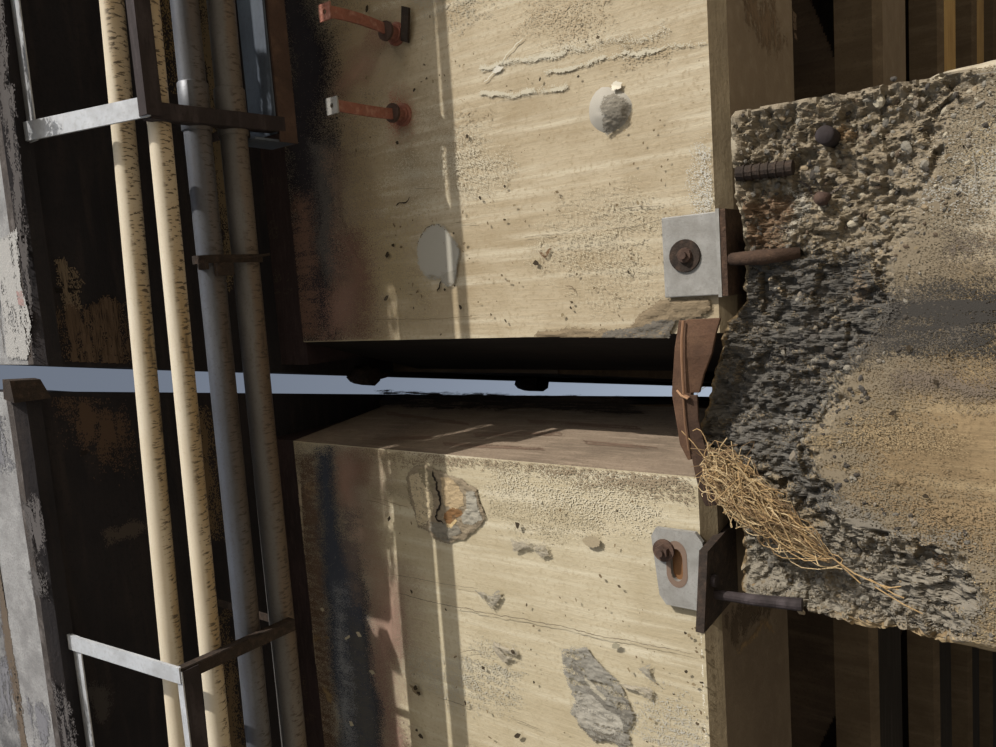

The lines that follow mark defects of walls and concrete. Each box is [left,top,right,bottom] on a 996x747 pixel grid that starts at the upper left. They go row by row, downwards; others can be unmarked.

spalling [600,93,629,135]
damp [292,0,713,340]
spalling [701,67,996,643]
damp [297,471,305,554]
spalling [406,464,486,544]
damp [802,408,996,644]
spalling [560,646,635,747]